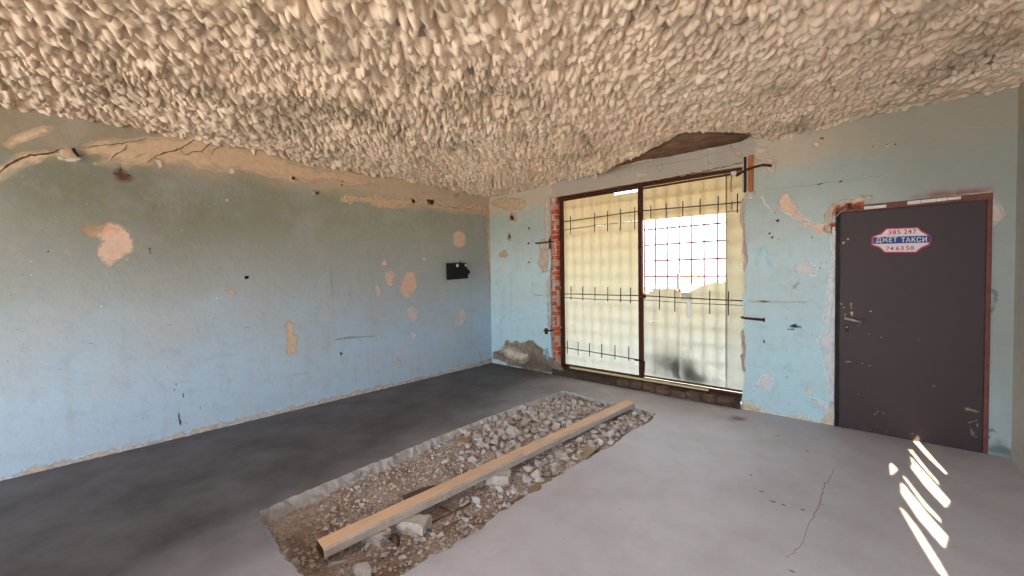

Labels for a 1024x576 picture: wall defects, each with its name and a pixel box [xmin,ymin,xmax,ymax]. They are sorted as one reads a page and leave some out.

crack [0,138,219,173]
flaking render [0,138,525,275]
flaking render [768,193,872,258]
flaking render [0,198,563,481]
flaking render [741,283,853,426]